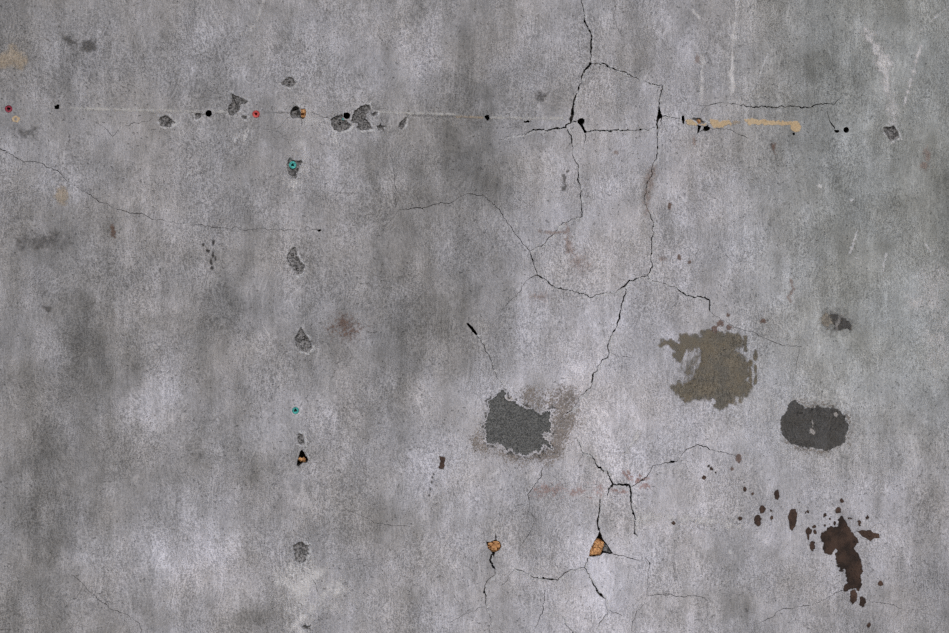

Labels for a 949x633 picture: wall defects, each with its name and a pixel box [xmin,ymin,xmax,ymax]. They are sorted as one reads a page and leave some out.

spalling [228,91,250,121]
spalling [329,102,386,133]
crack [384,0,842,414]
spalling [287,247,307,278]
spalling [294,327,315,355]
water stain [659,329,758,410]
peeling [468,381,586,470]
crack [448,439,742,633]
spalling [291,541,312,566]